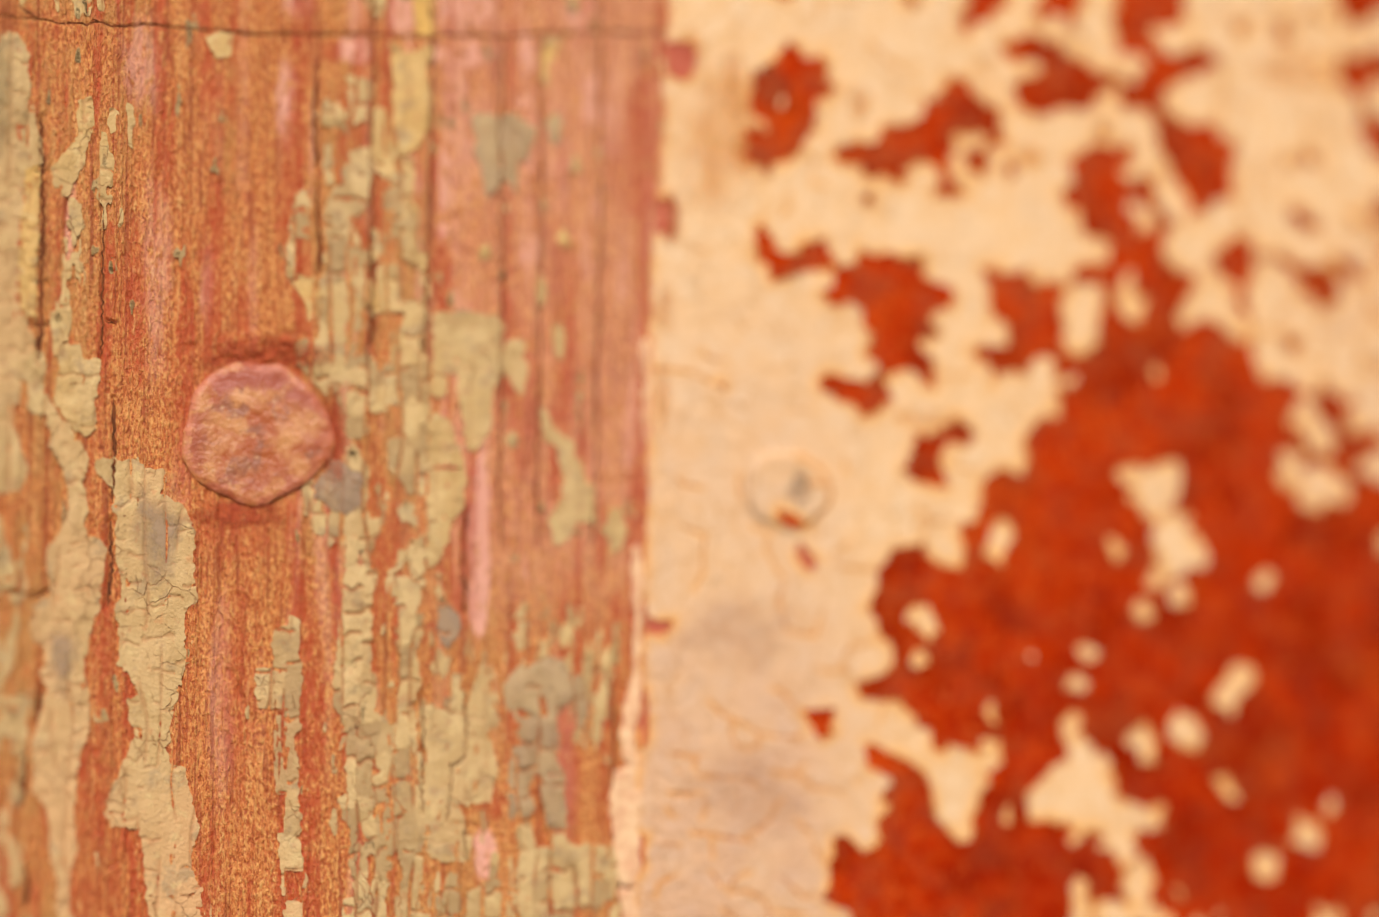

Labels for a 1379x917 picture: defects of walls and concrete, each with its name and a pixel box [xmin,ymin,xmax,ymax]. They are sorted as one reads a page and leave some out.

peeling [54,0,105,19]
peeling [185,13,234,58]
peeling [739,40,838,178]
peeling [755,224,955,416]
peeling [0,31,214,917]
peeling [278,0,672,917]
peeling [777,509,817,570]
peeling [823,0,1379,917]
peeling [245,615,308,917]
peeling [803,707,835,739]